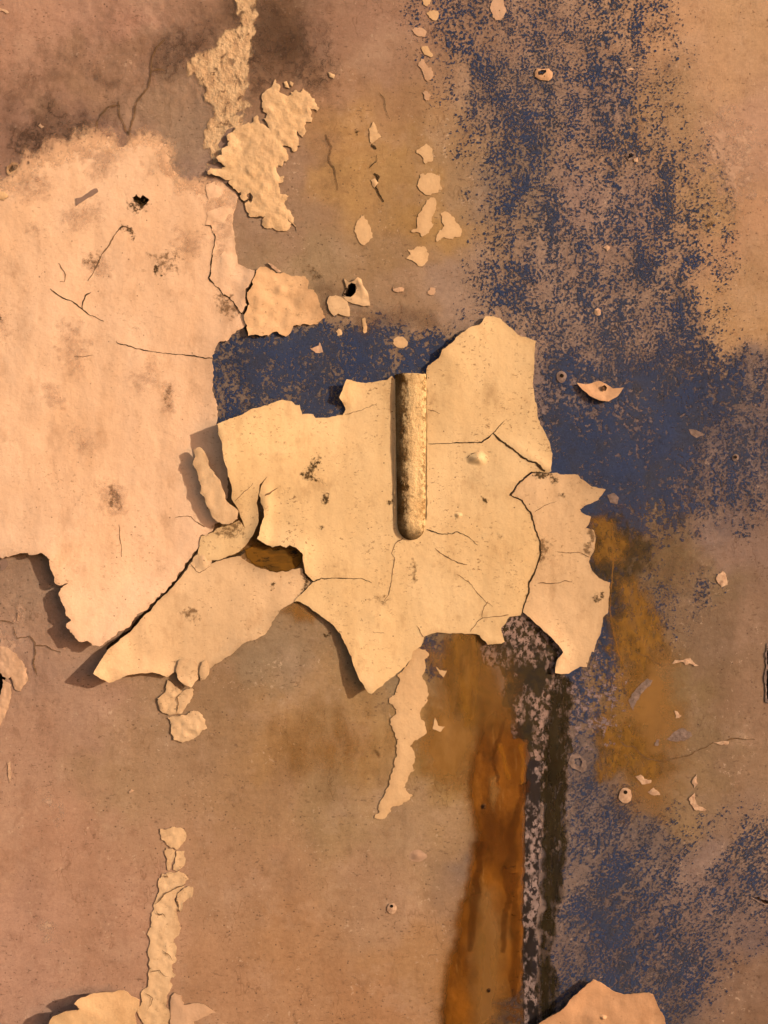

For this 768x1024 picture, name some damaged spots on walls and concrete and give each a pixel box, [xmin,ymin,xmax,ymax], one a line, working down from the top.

leakage [11,103,89,155]
crack [52,226,134,321]
crack [118,343,210,359]
crack [205,225,256,336]
peeling [0,0,768,819]
crack [427,423,589,630]
leakage [584,518,652,617]
corrosion [590,517,679,805]
peeling [49,826,216,1024]
corrosion [420,634,528,1024]
leakage [480,613,630,1024]
peeling [538,754,768,1024]